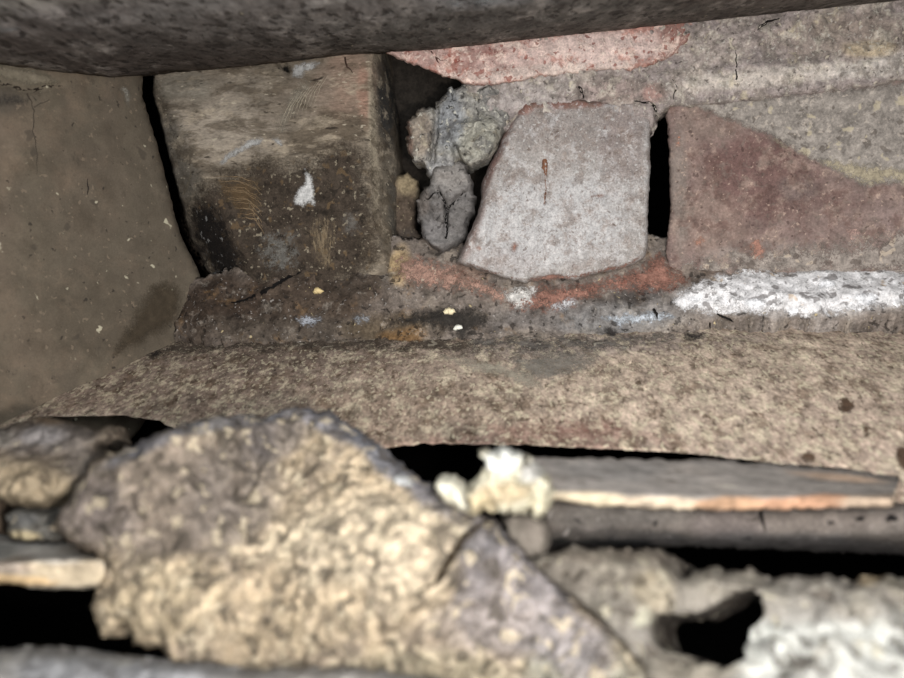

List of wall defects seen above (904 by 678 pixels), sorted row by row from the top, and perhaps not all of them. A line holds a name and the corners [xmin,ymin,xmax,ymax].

crack [424,190,463,239]